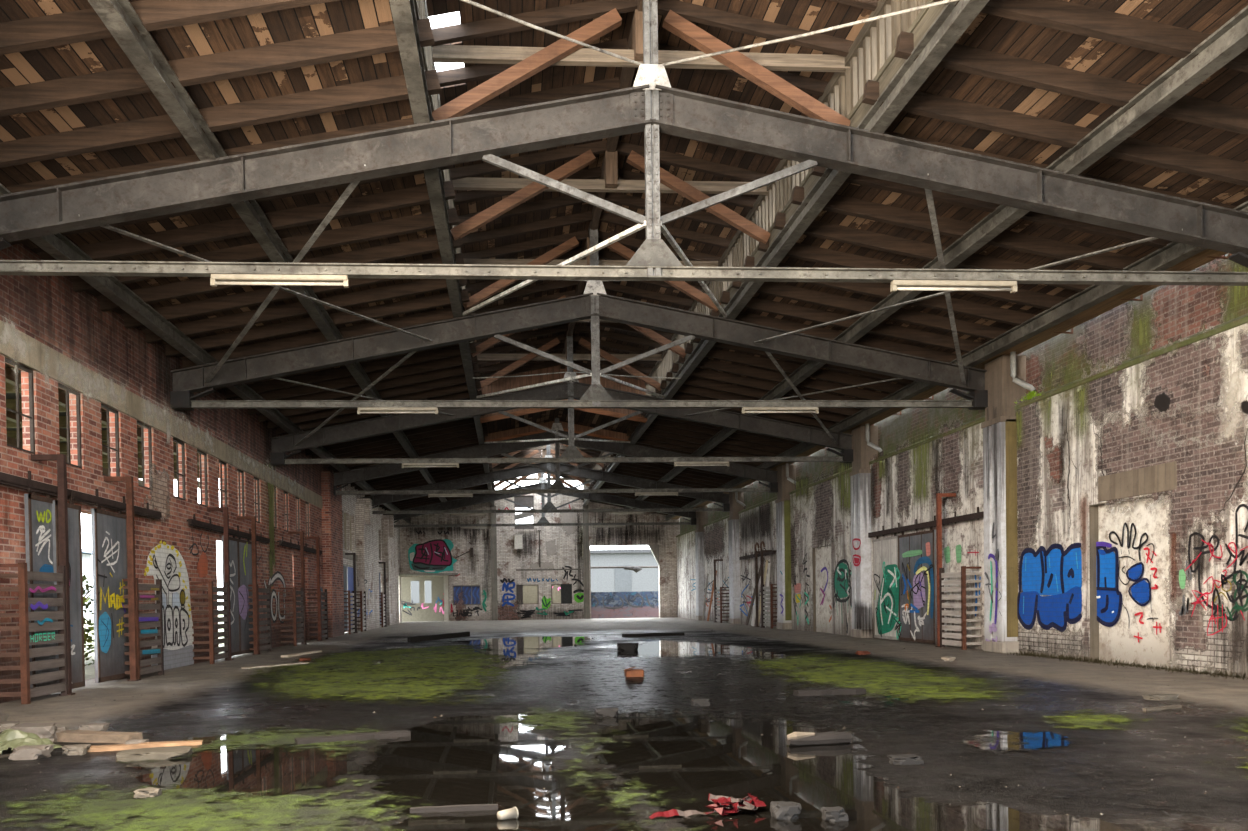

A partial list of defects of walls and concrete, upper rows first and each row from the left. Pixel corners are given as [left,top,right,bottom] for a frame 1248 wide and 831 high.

flaking render [812,469,834,549]
flaking render [872,439,912,518]
flaking render [938,416,963,514]
flaking render [1015,255,1248,675]